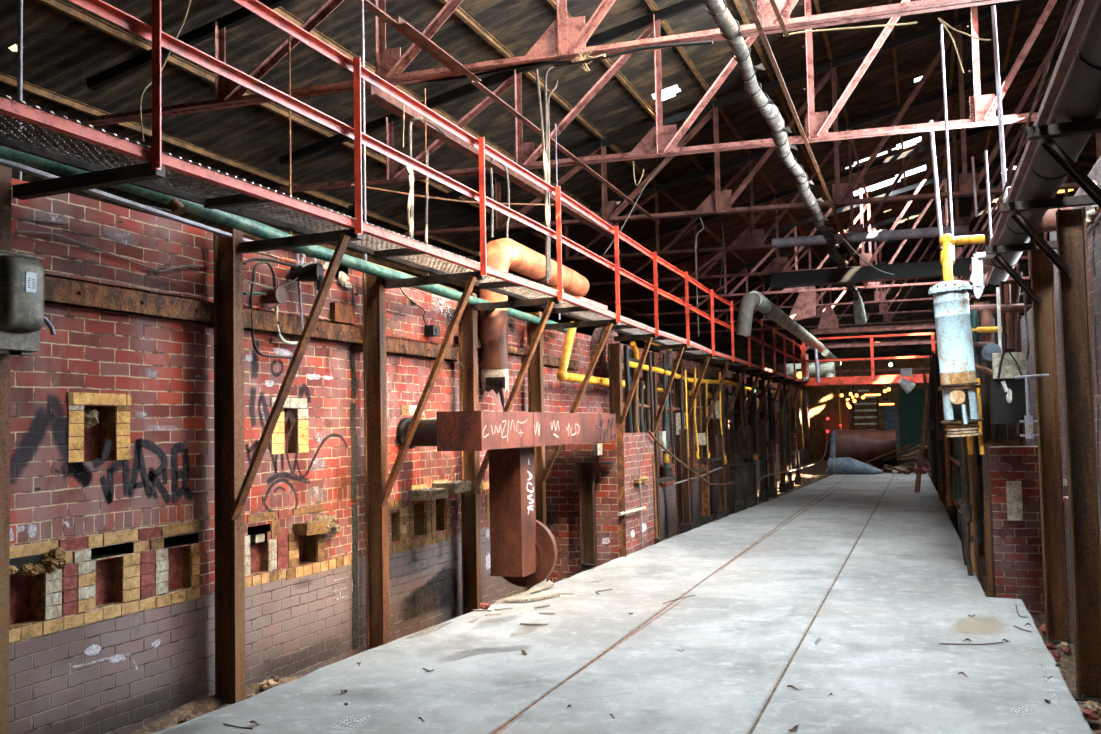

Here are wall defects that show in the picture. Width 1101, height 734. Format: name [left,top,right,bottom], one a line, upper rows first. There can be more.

corrosion [940,371,977,385]